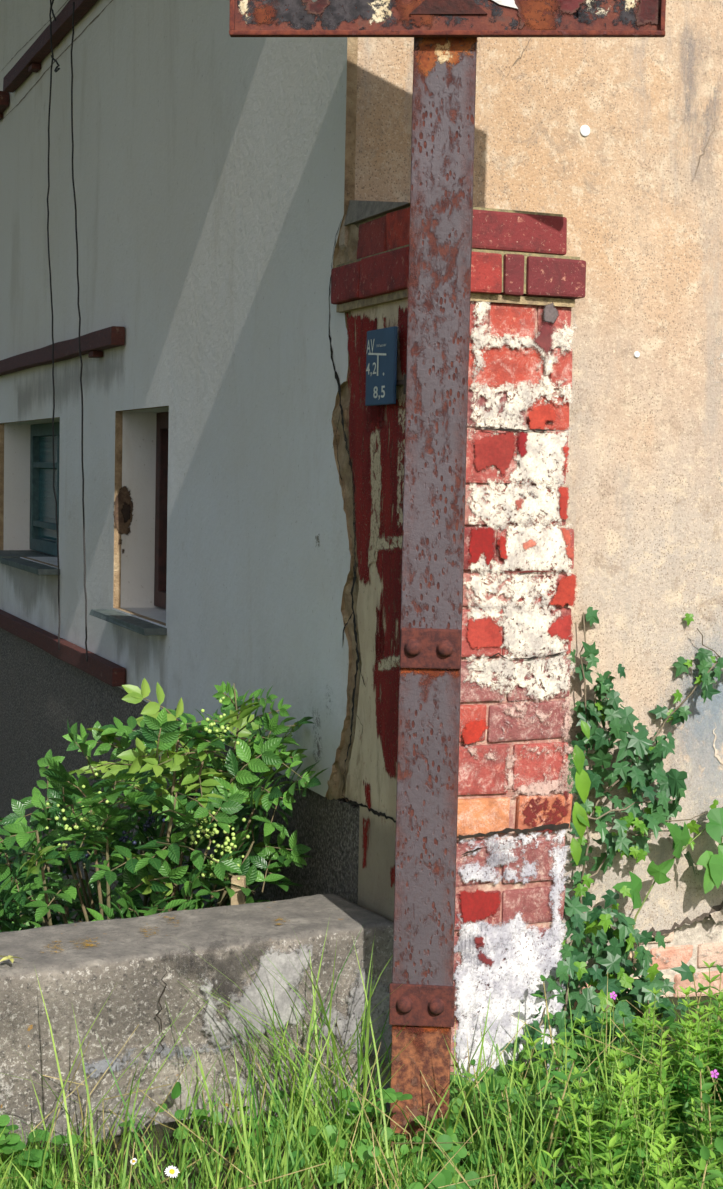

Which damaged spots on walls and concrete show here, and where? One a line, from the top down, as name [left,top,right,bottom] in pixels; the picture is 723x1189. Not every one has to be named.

crack [329,222,396,823]
peeling [327,306,408,800]
peeling [462,301,577,834]
peeling [362,779,371,868]
peeling [459,888,501,923]
peeling [474,936,495,967]
flaking render [614,901,723,1002]